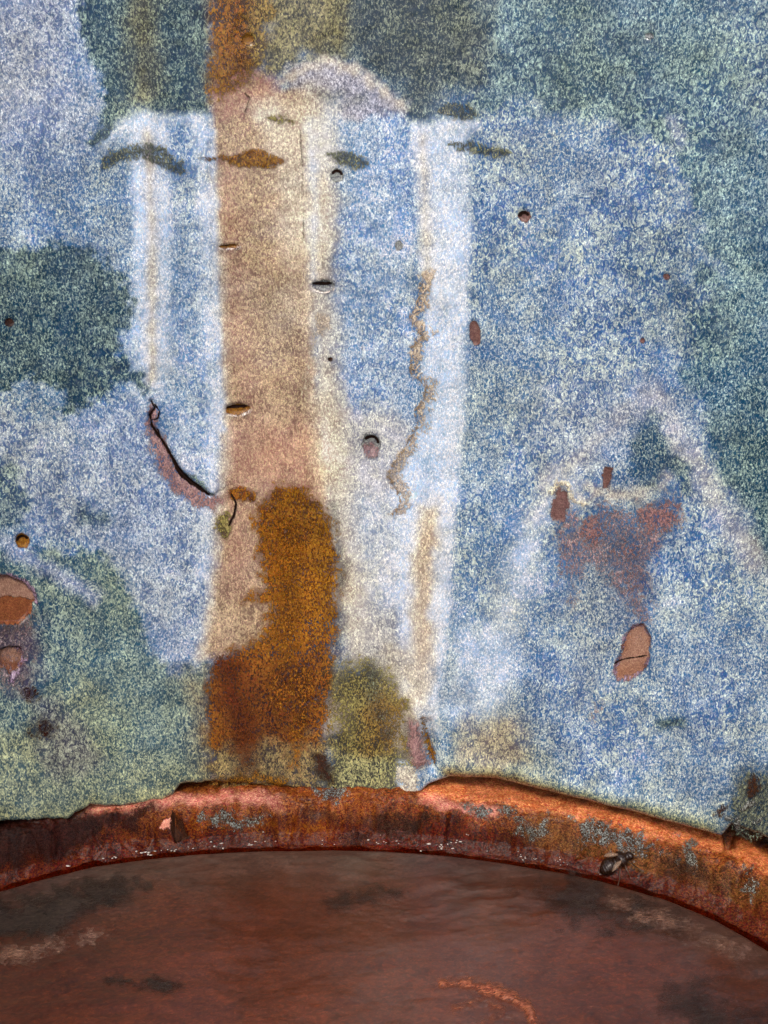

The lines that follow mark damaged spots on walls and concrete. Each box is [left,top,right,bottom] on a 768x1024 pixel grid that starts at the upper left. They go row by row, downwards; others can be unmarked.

rust [205,0,276,102]
spalling [469,321,480,345]
crack [144,400,237,526]
spalling [548,479,587,522]
spalling [0,572,38,625]
spalling [0,646,27,683]
rust [201,481,344,788]
spalling [612,622,651,682]